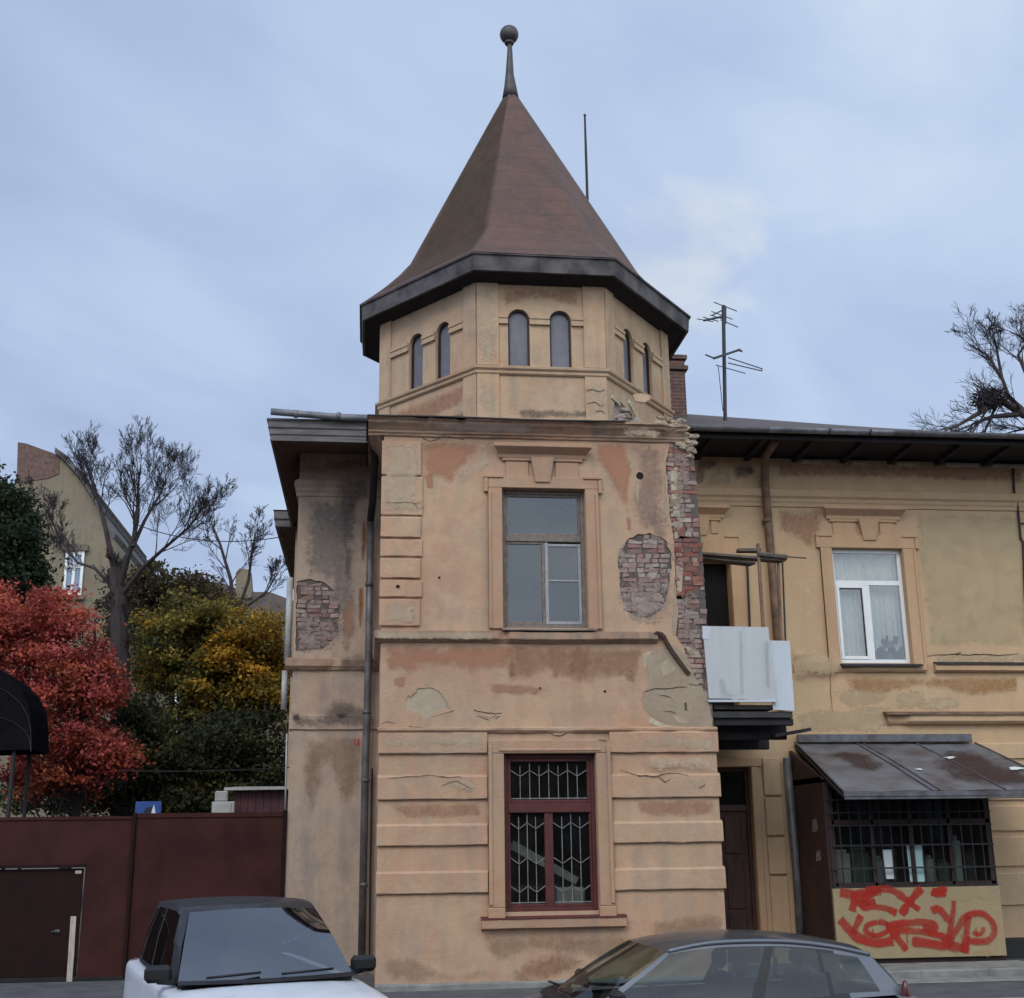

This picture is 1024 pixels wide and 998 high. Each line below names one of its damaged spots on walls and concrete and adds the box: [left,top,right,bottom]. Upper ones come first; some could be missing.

spalling [586,384,714,786]
flaking render [295,579,353,651]
spalling [405,688,454,719]
crack [394,775,470,788]
crack [620,770,705,788]